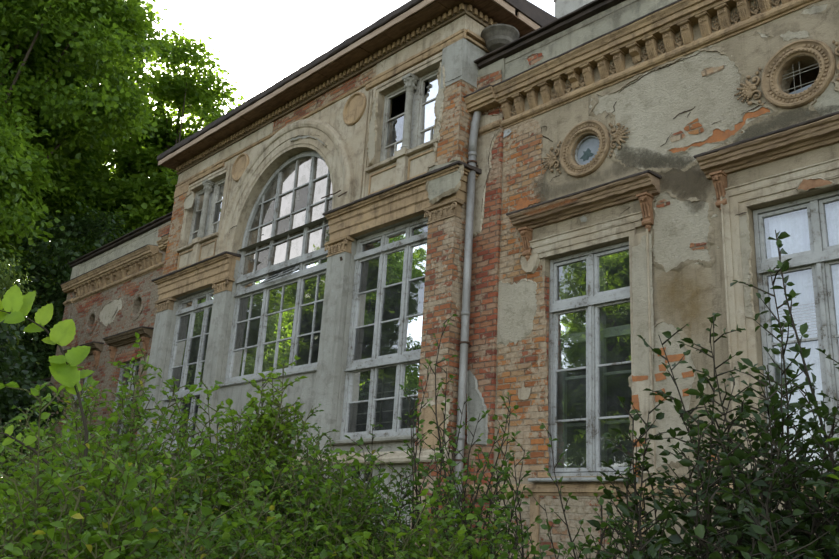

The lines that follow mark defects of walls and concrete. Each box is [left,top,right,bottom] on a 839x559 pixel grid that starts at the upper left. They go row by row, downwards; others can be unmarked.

spalling [433,62,446,152]
spalling [588,45,778,173]
spalling [425,156,464,204]
damp [613,146,708,209]
spalling [796,177,834,192]
spalling [98,295,124,328]
flaking render [466,105,550,481]
spalling [628,189,721,484]